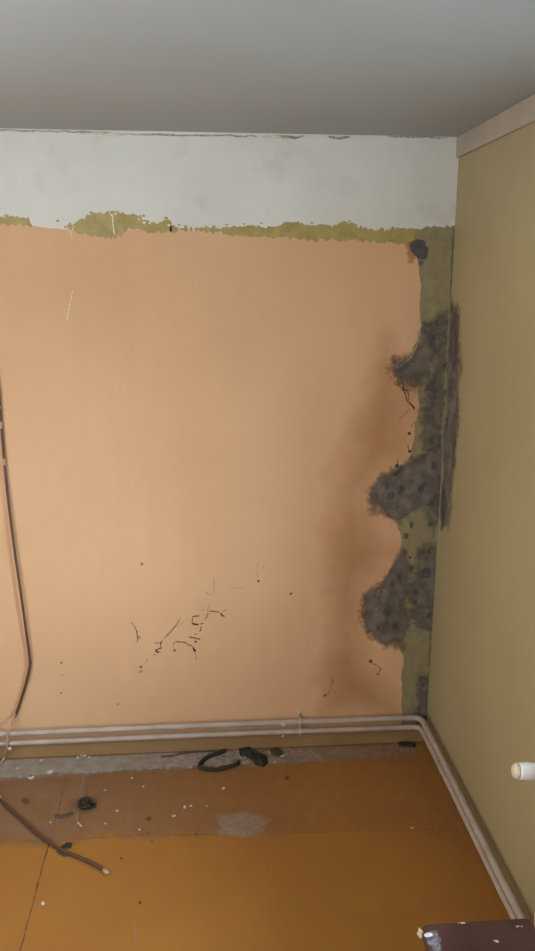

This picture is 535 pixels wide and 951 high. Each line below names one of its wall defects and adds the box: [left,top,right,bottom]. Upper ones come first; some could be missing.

peeling [0,214,32,227]
peeling [56,211,455,470]
damp [362,303,460,650]
peeling [382,506,439,725]